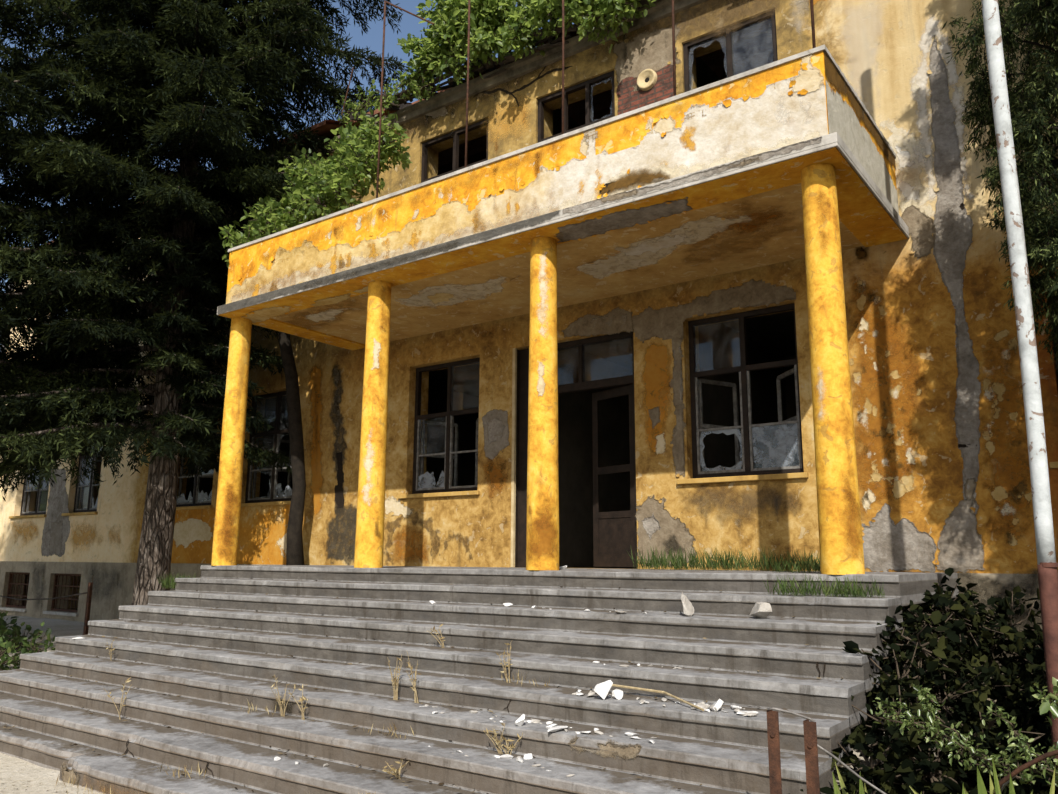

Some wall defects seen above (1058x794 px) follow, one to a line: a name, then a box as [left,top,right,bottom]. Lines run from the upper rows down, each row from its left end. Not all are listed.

peeling [226,23,1032,573]
peeling [173,518,213,548]
leakage [326,365,357,565]